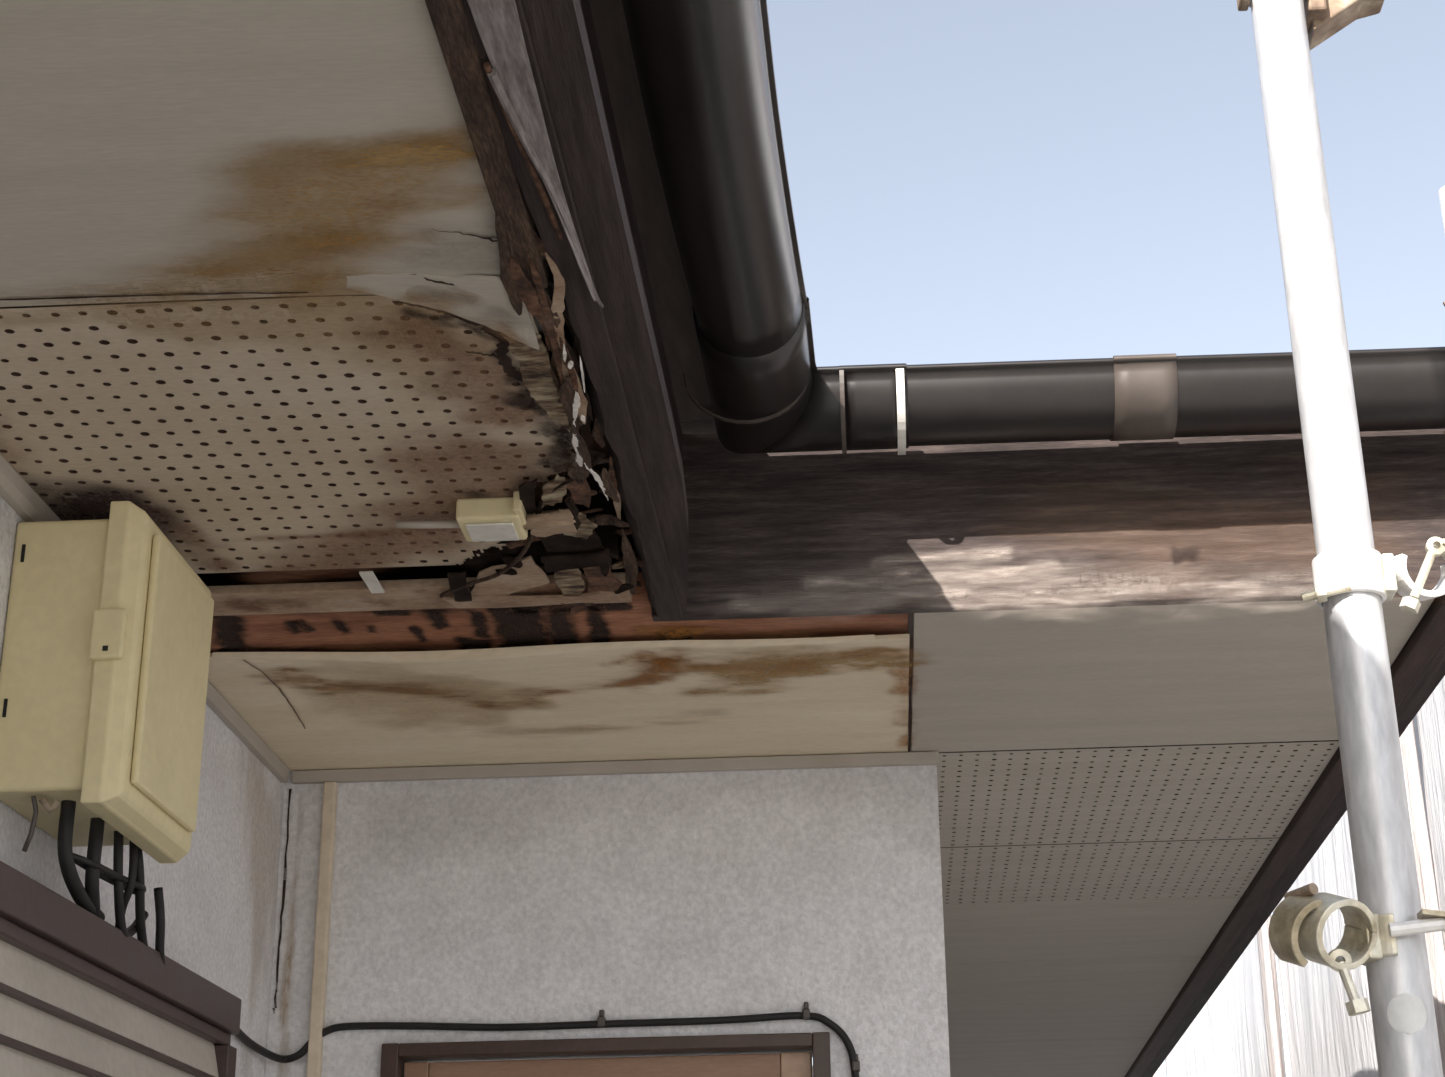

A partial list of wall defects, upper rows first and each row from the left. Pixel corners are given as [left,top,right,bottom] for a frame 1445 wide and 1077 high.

peeling [467,0,604,308]
damp [75,139,476,308]
peeling [538,344,630,527]
damp [212,600,497,707]
damp [261,445,534,578]
damp [364,584,633,652]
peeling [495,536,554,575]
peeling [610,546,642,594]
damp [604,659,680,687]